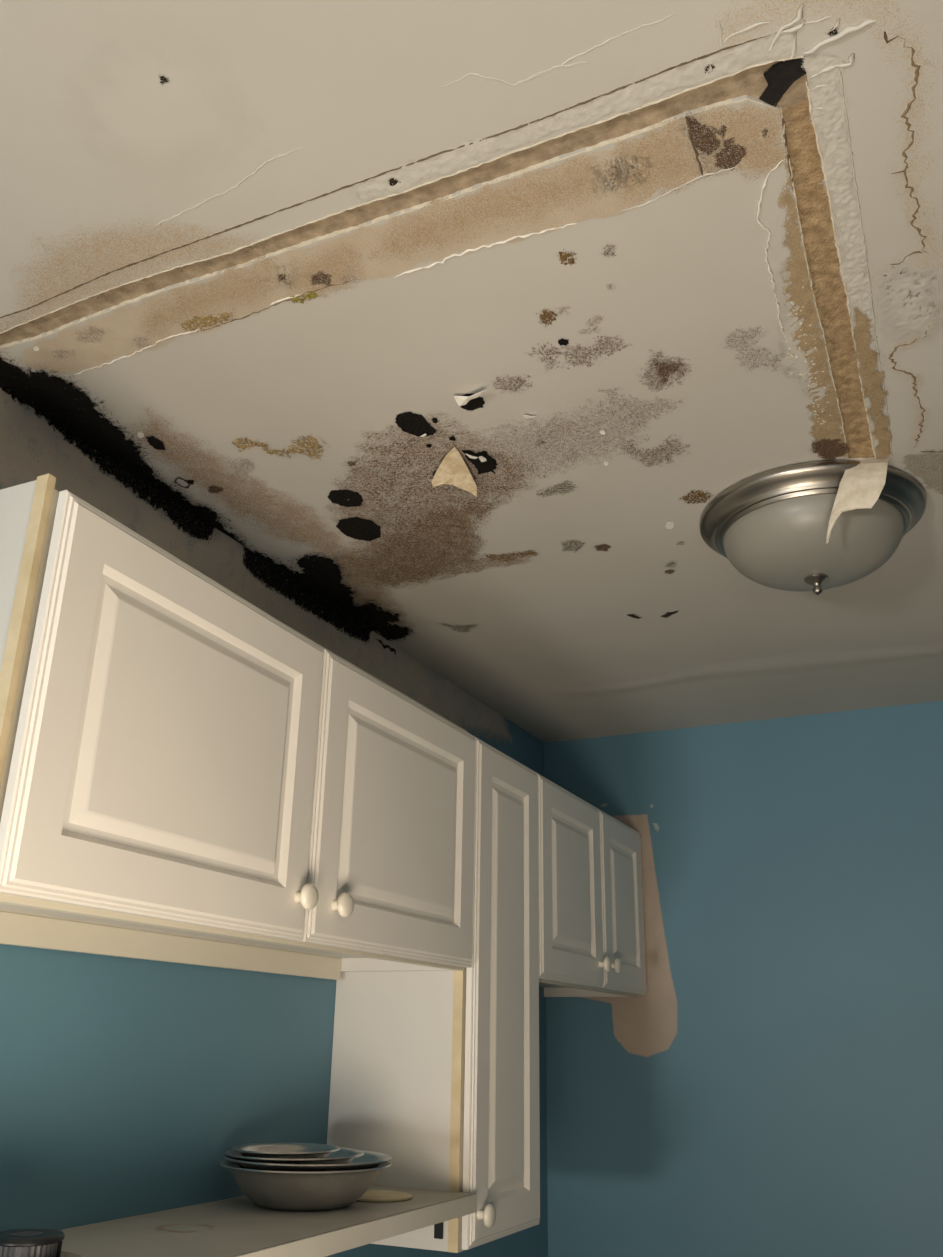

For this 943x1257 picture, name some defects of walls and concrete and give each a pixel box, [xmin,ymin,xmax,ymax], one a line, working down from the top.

crack [0,33,776,319]
peeling [19,3,876,461]
crack [439,14,675,88]
flaking render [0,388,513,743]
leakage [0,217,691,655]
leakage [679,489,713,504]
peeling [850,306,893,459]
flaking render [579,805,678,1057]